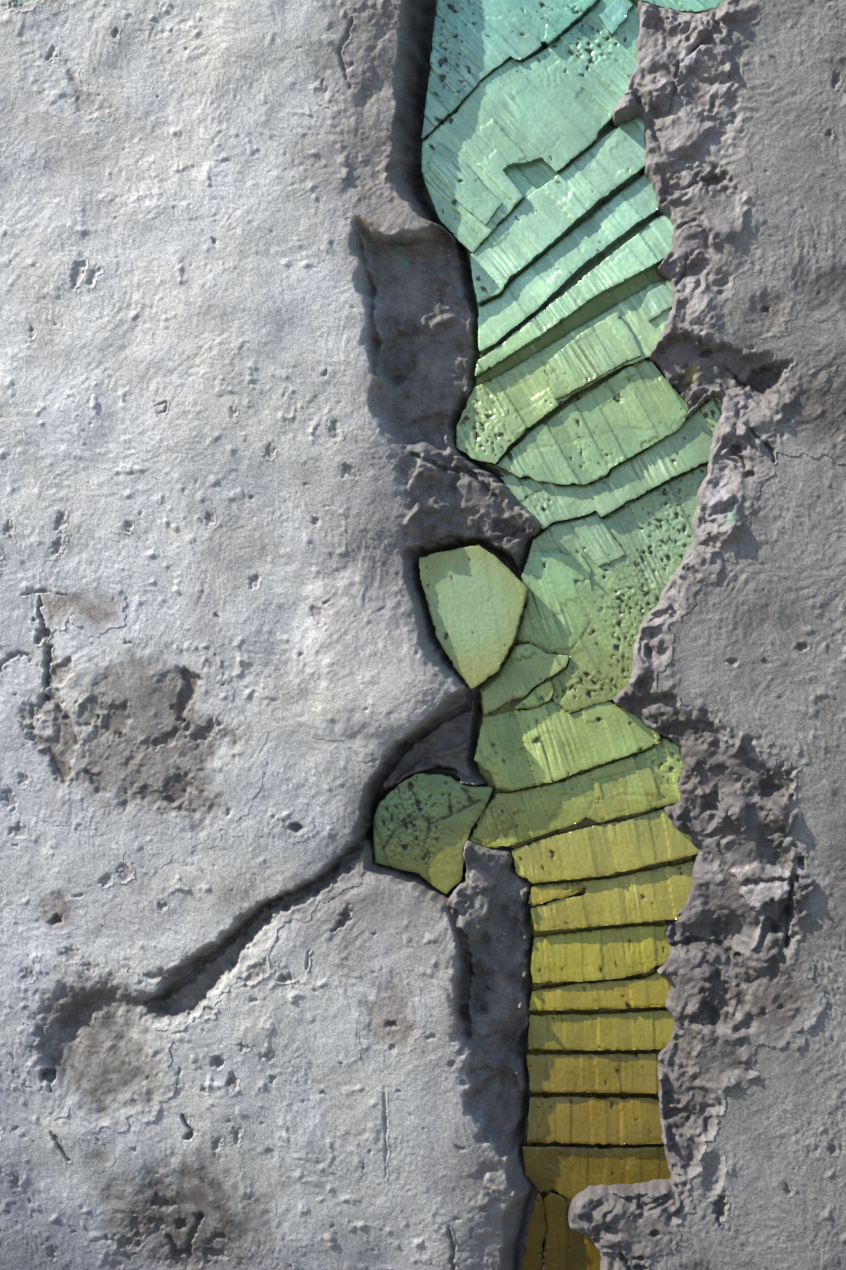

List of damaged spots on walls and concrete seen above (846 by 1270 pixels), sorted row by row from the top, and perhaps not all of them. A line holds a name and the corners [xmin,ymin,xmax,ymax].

spalling [309,0,545,579]
spalling [612,0,815,1180]
spalling [353,704,488,836]
damp [15,964,179,1132]
crack [49,784,483,1032]
spalling [383,1019,400,1031]
spalling [427,833,536,1270]
spalling [781,1182,796,1198]